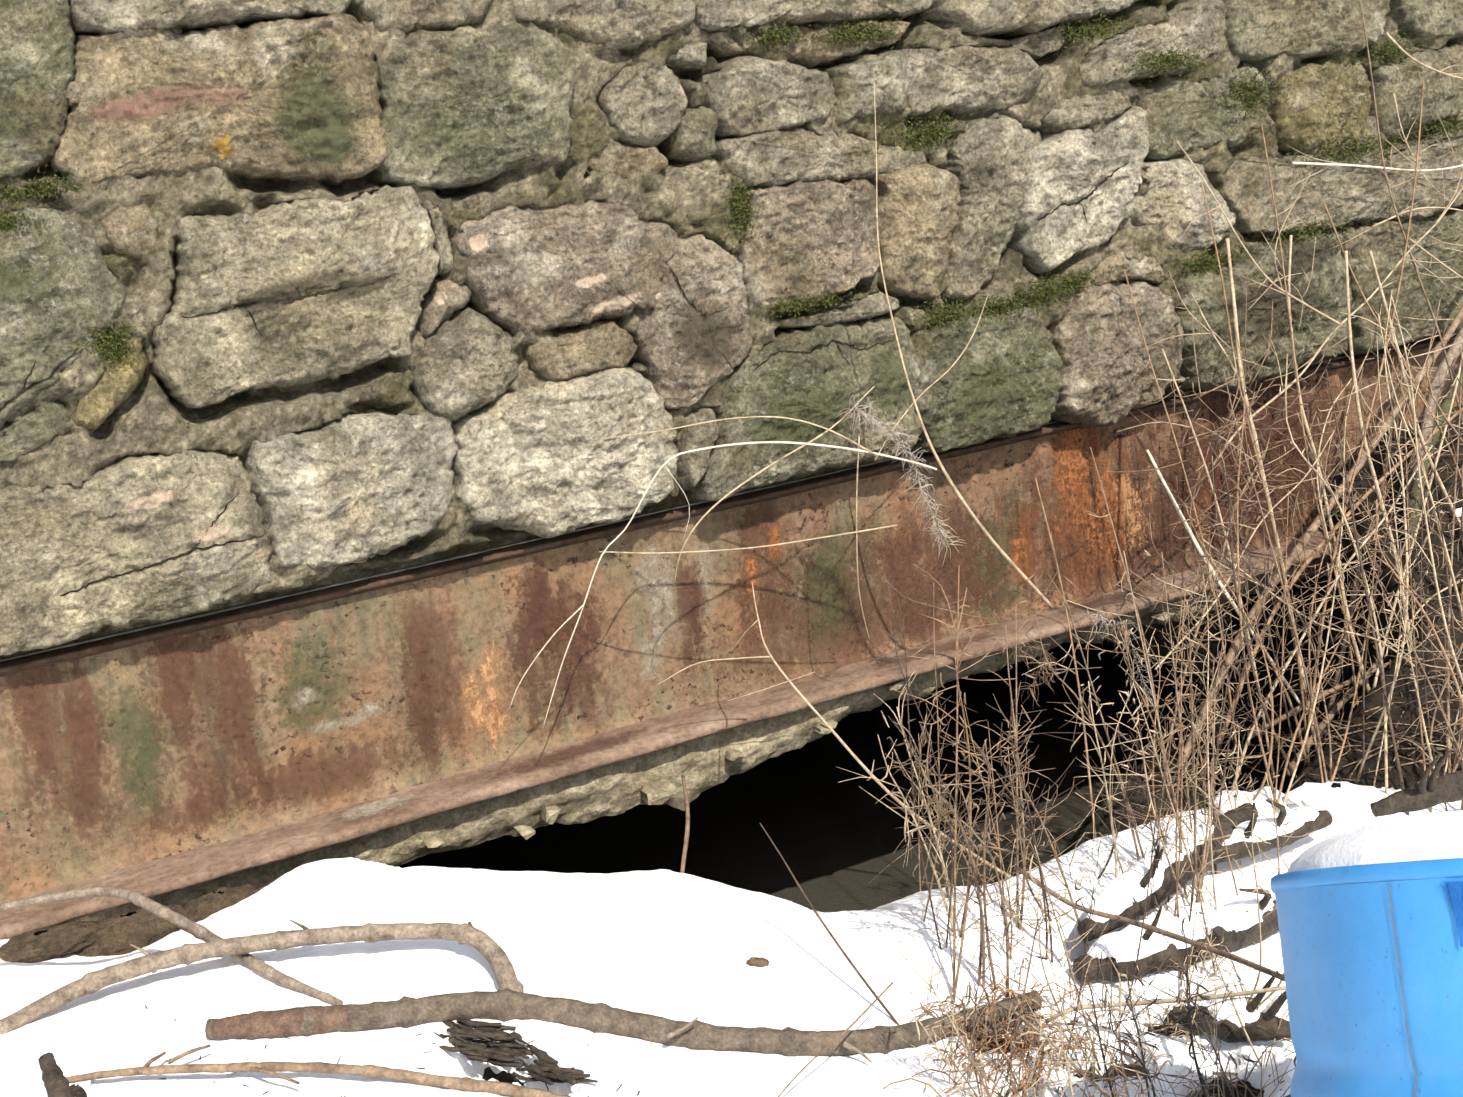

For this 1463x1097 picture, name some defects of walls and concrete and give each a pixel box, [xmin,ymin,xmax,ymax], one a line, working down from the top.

crack [182,273,400,337]
crack [60,491,264,596]
rust [674,548,705,659]
rust [745,526,781,594]
rust [464,565,634,773]
spalling [59,555,1330,925]